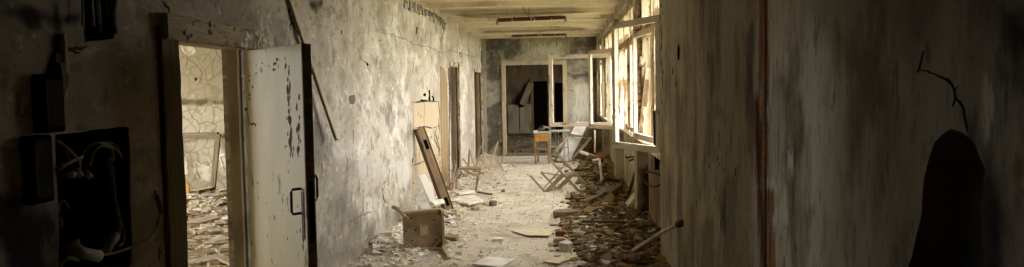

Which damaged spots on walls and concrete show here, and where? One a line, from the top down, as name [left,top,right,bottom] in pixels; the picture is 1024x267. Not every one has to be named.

crack [916,51,968,131]